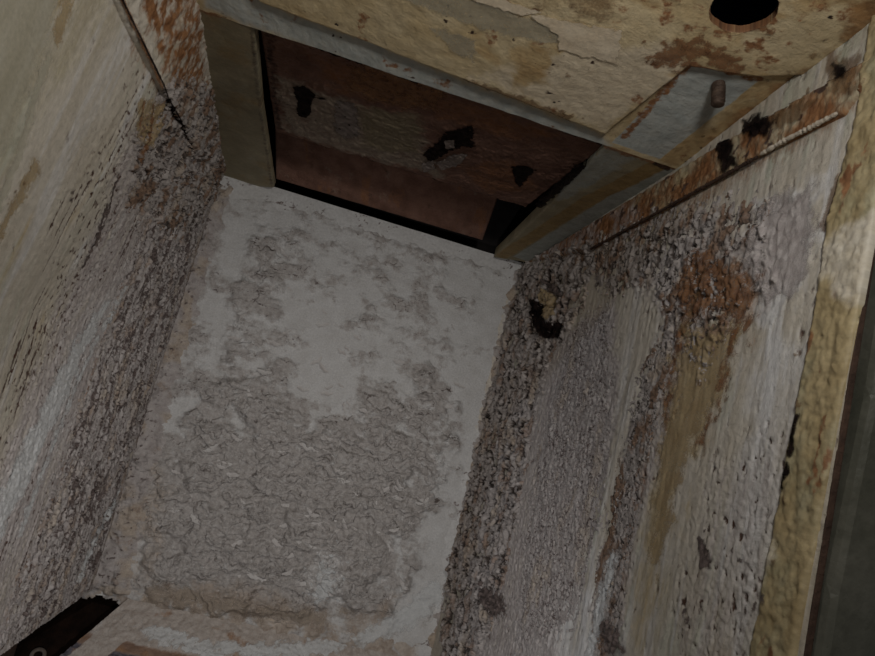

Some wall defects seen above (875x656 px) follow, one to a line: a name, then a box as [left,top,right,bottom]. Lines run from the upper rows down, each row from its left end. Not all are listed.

corrosion [316,48,447,110]
corrosion [464,79,573,121]
peeling [475,0,622,65]
corrosion [645,35,745,74]
corrosion [826,52,859,93]
peeling [129,198,596,656]
corrosion [648,249,766,564]
damp [585,552,618,656]